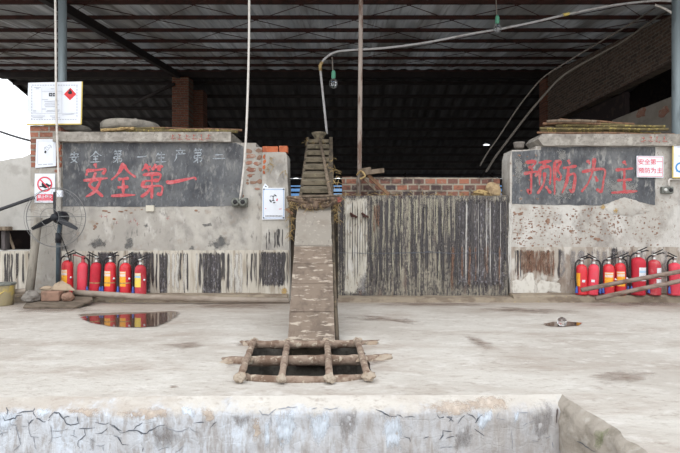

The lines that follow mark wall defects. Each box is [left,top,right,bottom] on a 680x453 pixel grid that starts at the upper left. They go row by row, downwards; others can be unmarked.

flaking render [245,148,266,190]
flaking render [513,198,661,247]
damp [125,229,288,294]
rust [517,250,554,278]
crack [0,407,216,453]
crack [404,412,534,449]